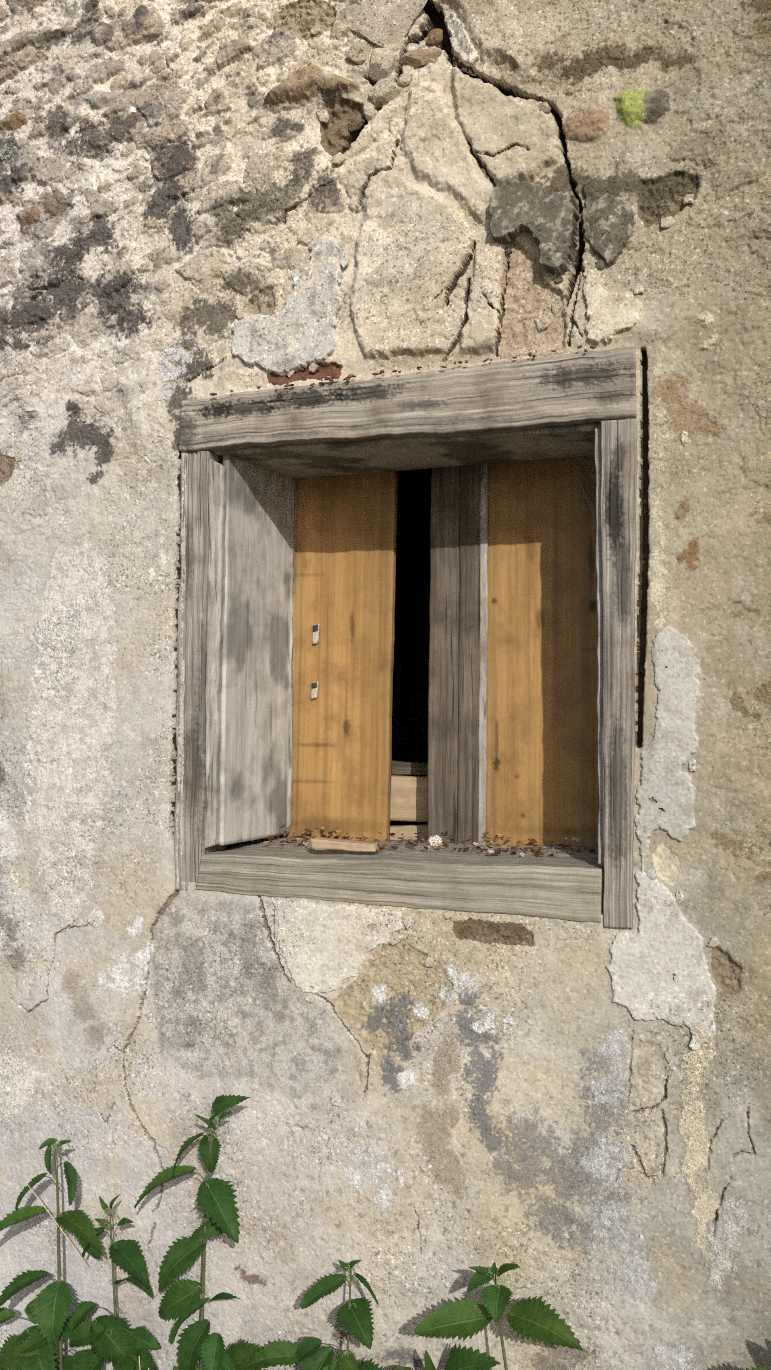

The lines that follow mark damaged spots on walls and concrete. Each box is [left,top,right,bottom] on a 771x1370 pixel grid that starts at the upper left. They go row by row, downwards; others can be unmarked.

peeling [231,238,349,386]
crack [345,0,585,362]
spalling [489,170,703,359]
peeling [605,352,743,1051]
crack [20,921,89,1013]
crack [100,891,179,1251]
peeling [147,895,454,1107]
crack [258,896,371,1092]
leakage [361,959,658,1308]
crack [627,1035,669,1179]
spalling [629,1038,672,1176]
crack [706,1107,756,1226]